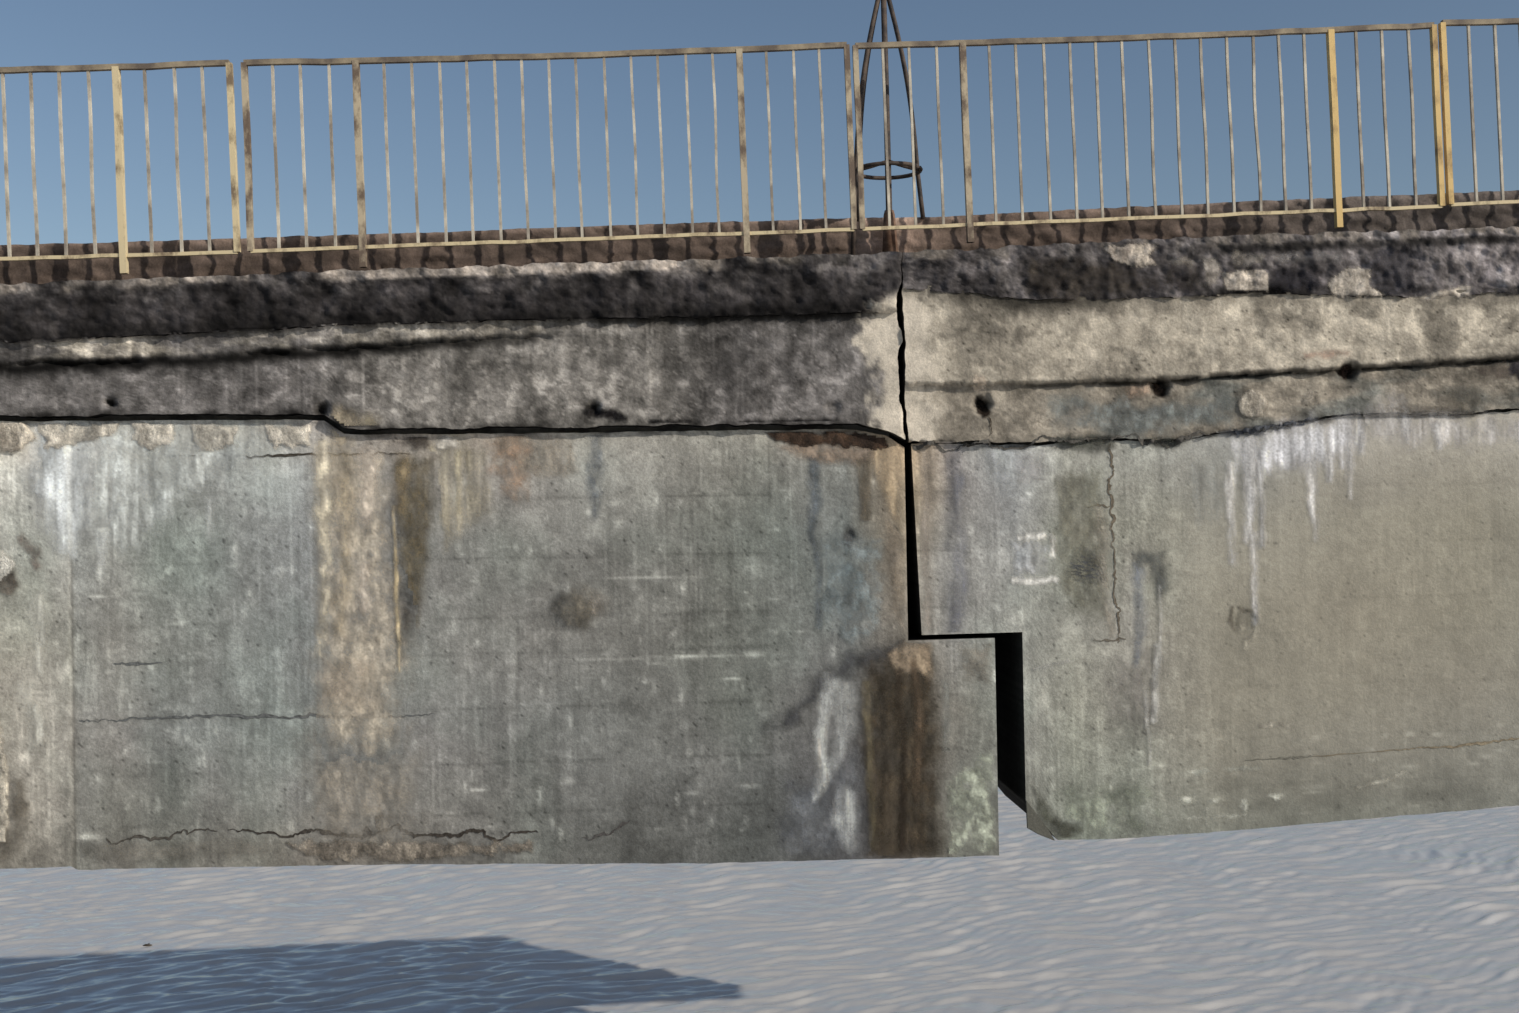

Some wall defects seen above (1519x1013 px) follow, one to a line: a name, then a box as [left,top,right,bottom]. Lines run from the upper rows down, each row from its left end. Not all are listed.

water stain [1029,258,1199,297]
water stain [1274,268,1322,290]
water stain [1374,249,1416,297]
water stain [1482,287,1519,295]
peeling [0,423,174,452]
peeling [192,424,237,451]
peeling [266,426,310,448]
water stain [1229,386,1516,558]
corrosion [392,437,430,671]
corrosion [865,647,938,856]